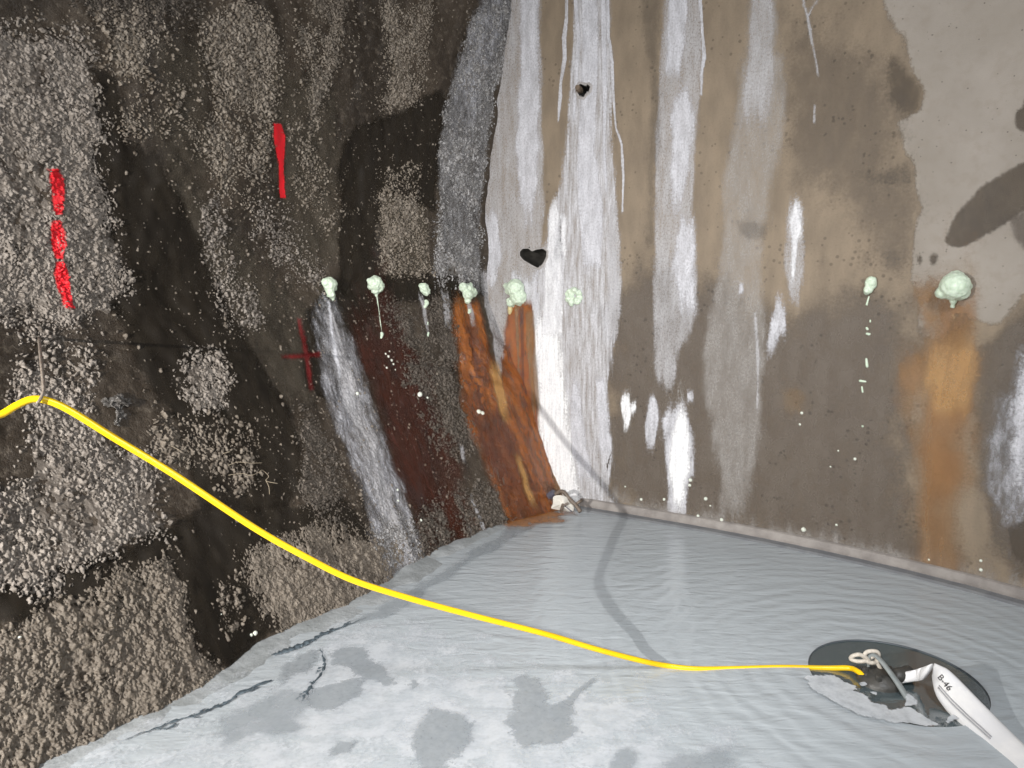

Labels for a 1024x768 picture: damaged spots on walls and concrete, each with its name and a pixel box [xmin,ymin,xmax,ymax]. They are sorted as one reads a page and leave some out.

corrosion [354,281,470,546]
damp [0,0,944,665]
corrosion [452,299,566,528]
corrosion [900,292,976,570]
damp [935,295,1024,588]
damp [946,163,1024,247]
damp [1016,107,1024,130]
crack [125,617,366,740]